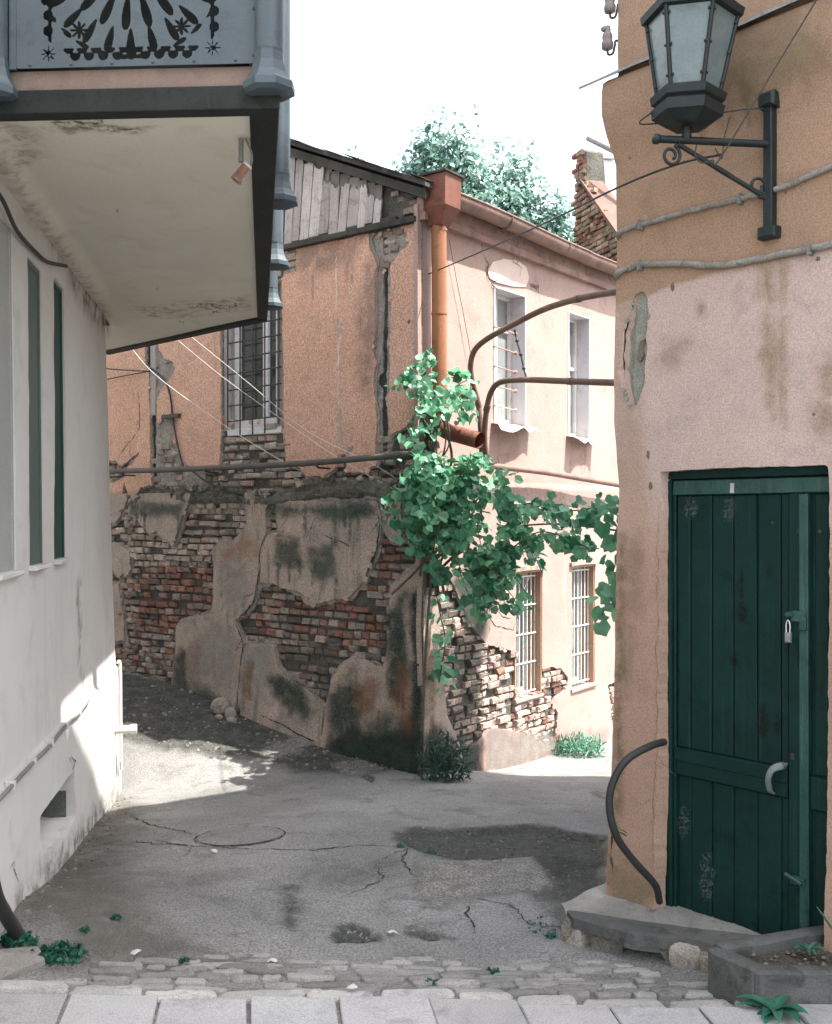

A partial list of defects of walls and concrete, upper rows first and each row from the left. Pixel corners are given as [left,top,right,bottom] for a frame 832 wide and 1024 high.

flaking render [378,229,404,274]
flaking render [622,292,651,409]
flaking render [202,399,440,491]
flaking render [111,503,246,682]
flaking render [242,532,568,746]
water stain [397,590,424,774]